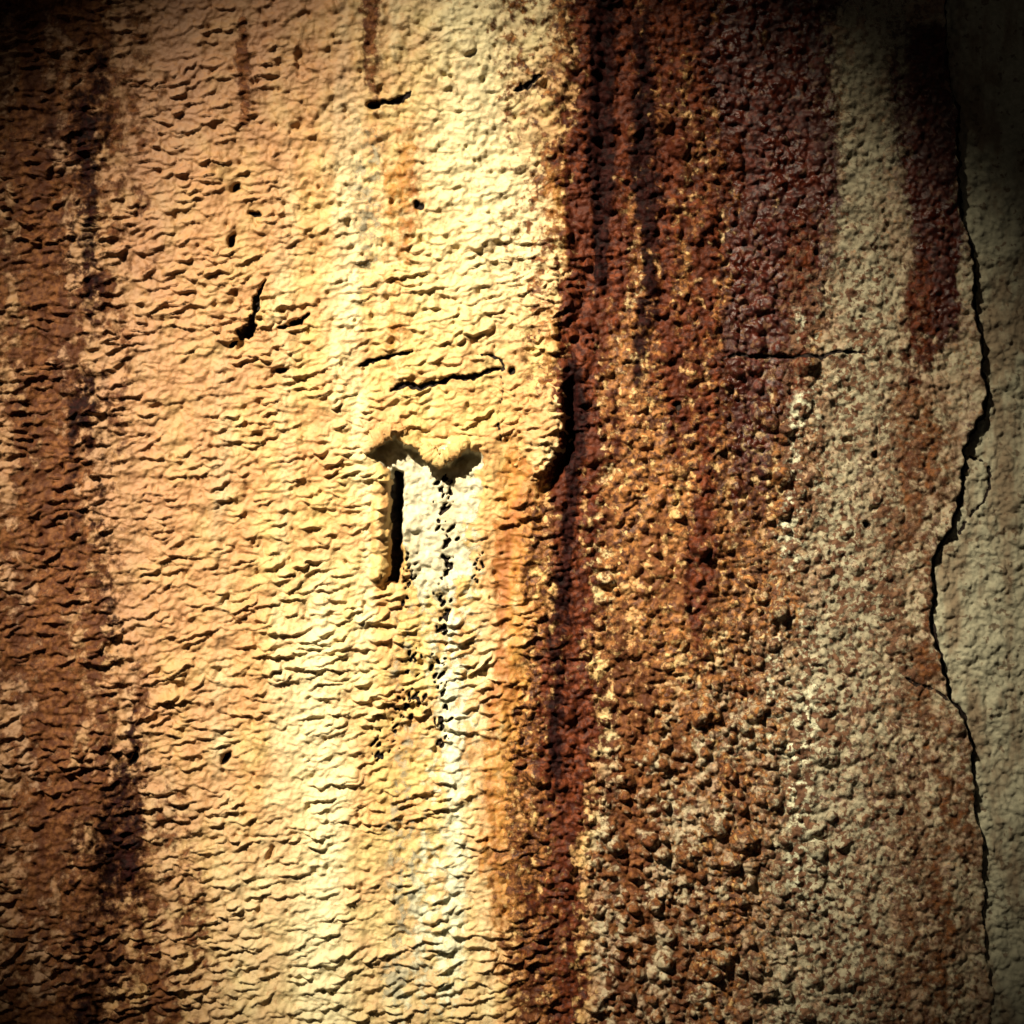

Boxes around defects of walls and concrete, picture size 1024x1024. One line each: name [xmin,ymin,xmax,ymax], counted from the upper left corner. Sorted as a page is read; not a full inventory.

crack [229,279,310,348]
spalling [362,421,484,614]
crack [390,354,505,441]
corrosion [478,0,854,1024]
crack [723,349,866,360]
corrosion [867,17,982,1024]
crack [905,0,992,975]